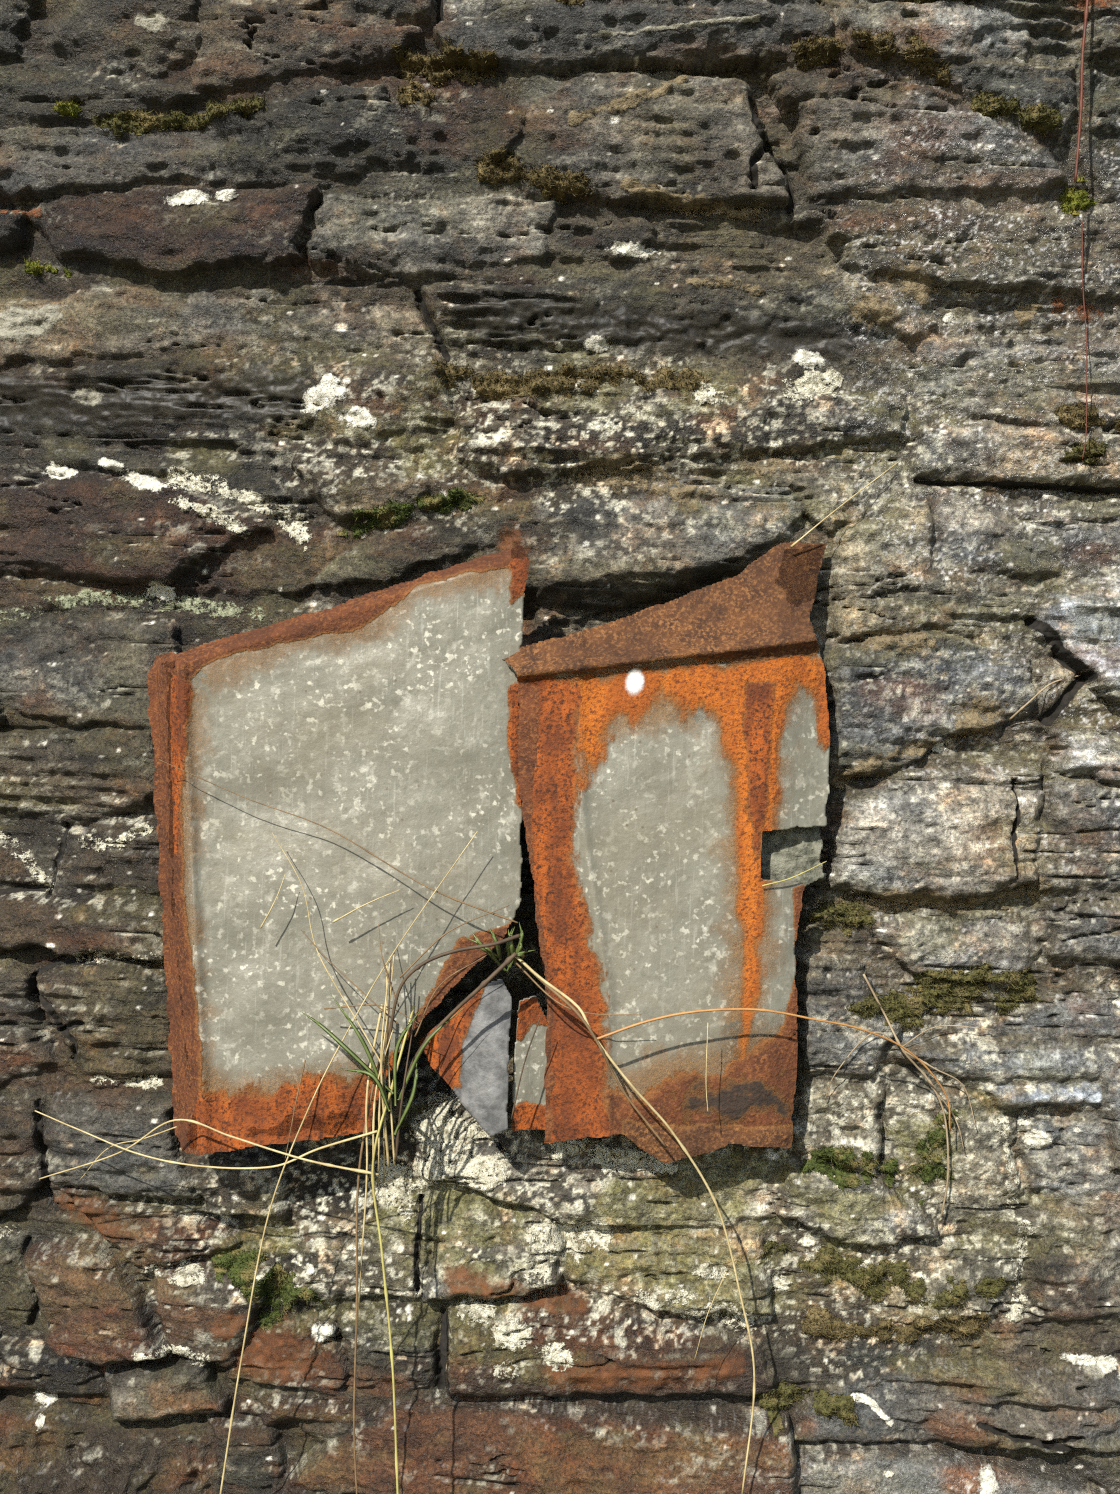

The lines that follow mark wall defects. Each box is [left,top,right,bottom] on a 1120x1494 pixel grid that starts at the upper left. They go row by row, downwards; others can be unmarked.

corrosion [502,542,830,1164]